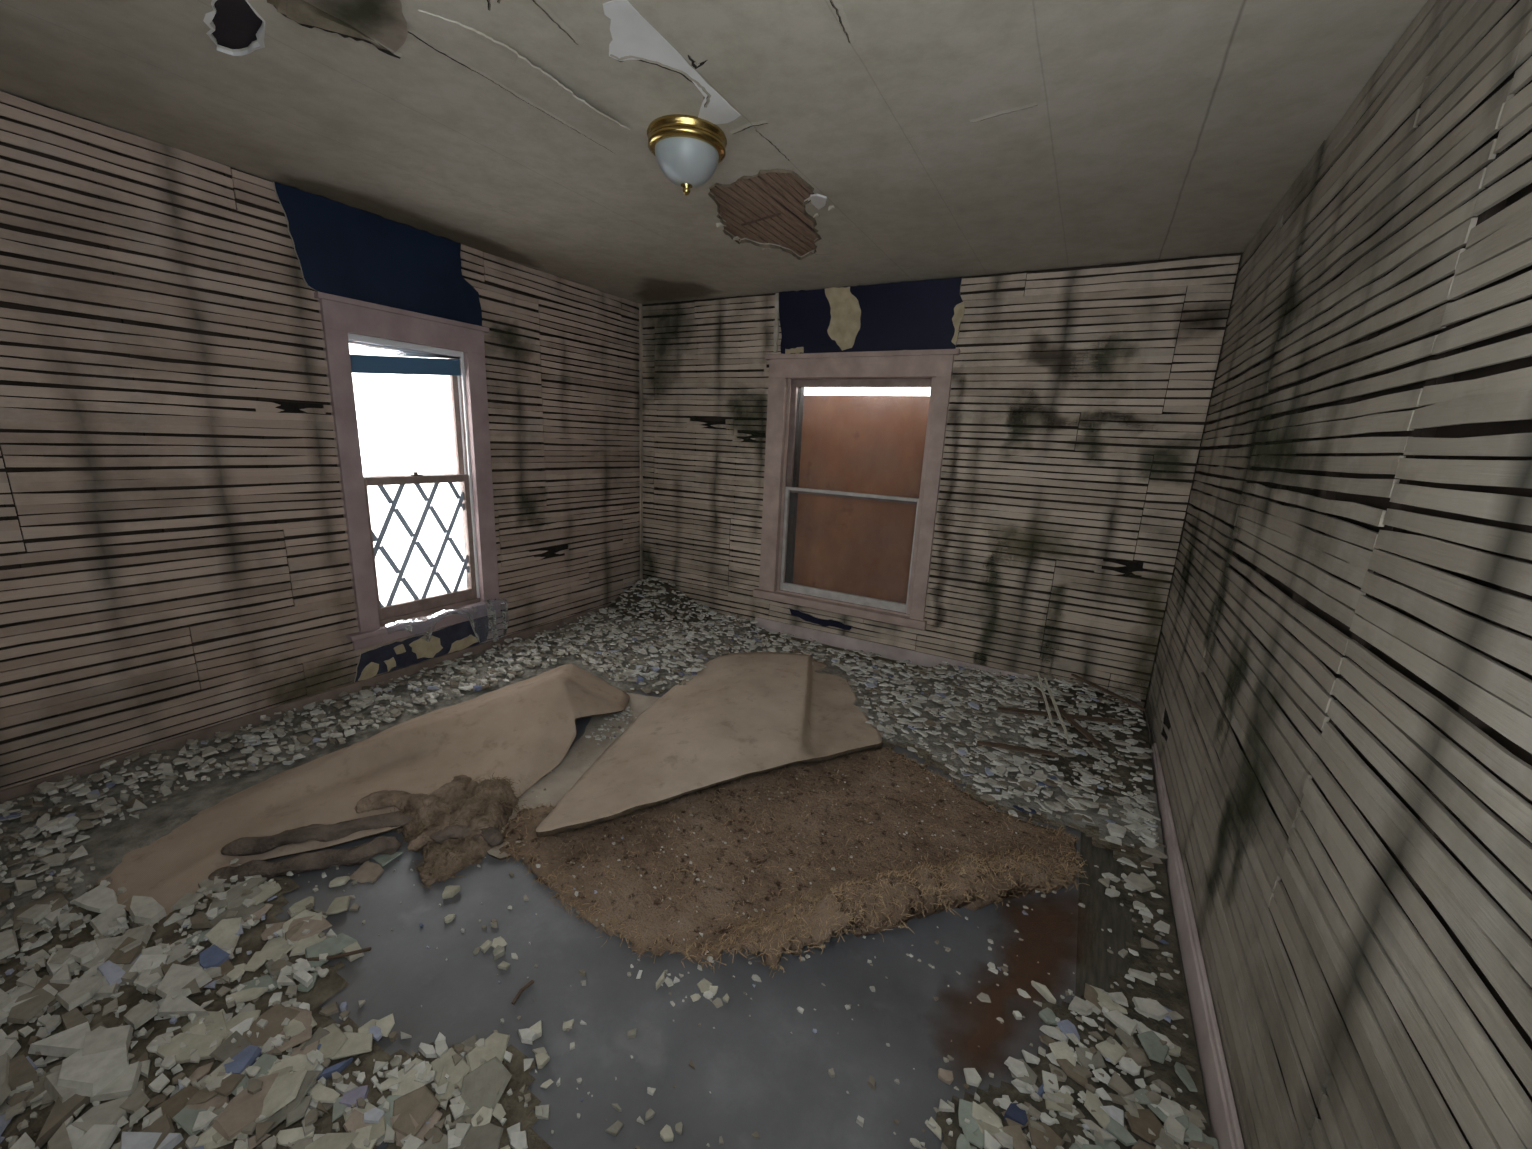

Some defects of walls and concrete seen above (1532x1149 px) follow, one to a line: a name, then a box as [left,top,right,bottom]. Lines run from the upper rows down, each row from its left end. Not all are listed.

peeling [203,0,408,59]
crack [408,29,619,154]
crack [487,0,793,161]
peeling [603,0,740,124]
flaking render [273,182,482,326]
flaking render [708,168,836,260]
flaking render [773,277,965,354]
water stain [1030,338,1131,377]
water stain [1010,405,1141,459]
water stain [975,529,1058,665]
flaking render [354,616,489,682]